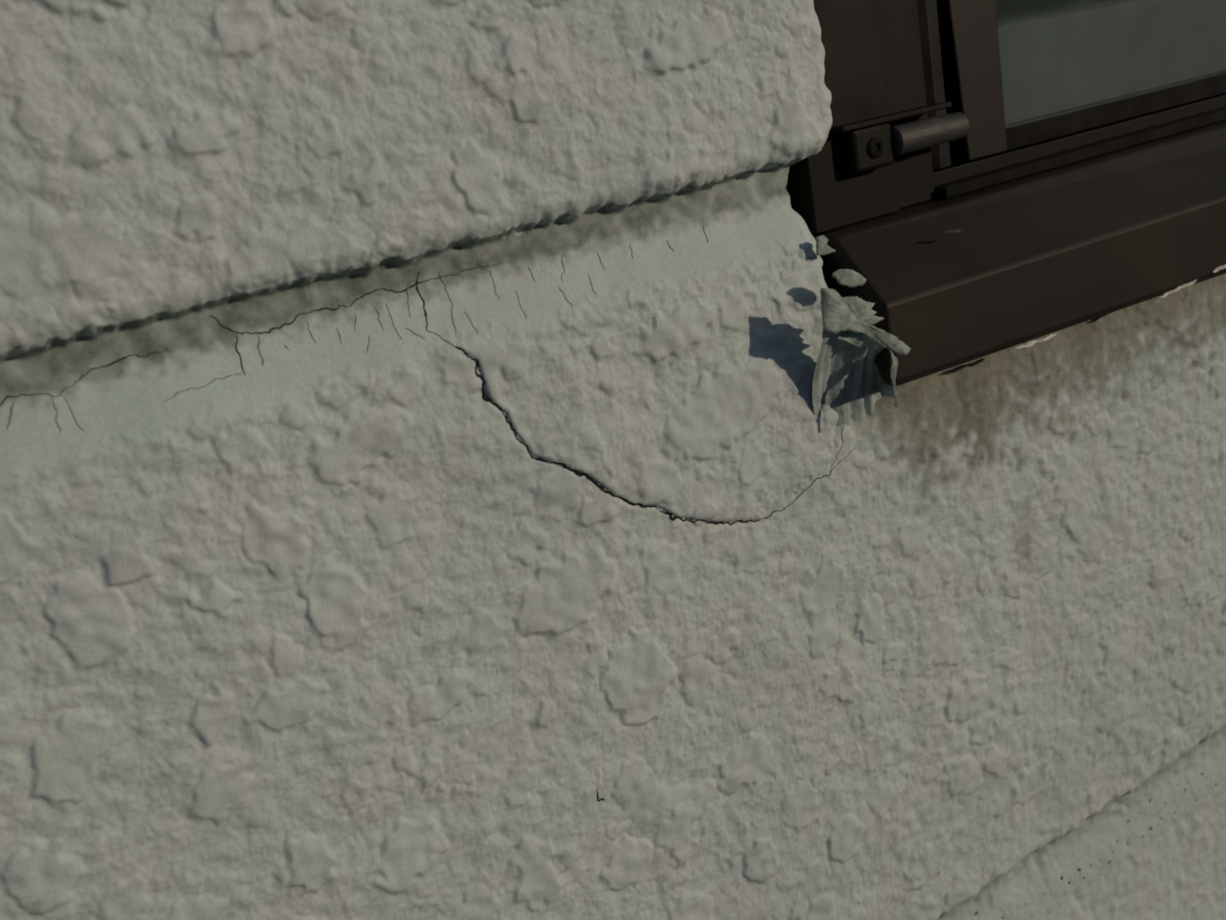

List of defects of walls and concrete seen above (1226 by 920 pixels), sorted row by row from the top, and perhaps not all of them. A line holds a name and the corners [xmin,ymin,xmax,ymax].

peeling [816,235,835,256]
crack [0,350,172,433]
crack [166,252,856,526]
peeling [812,269,911,428]